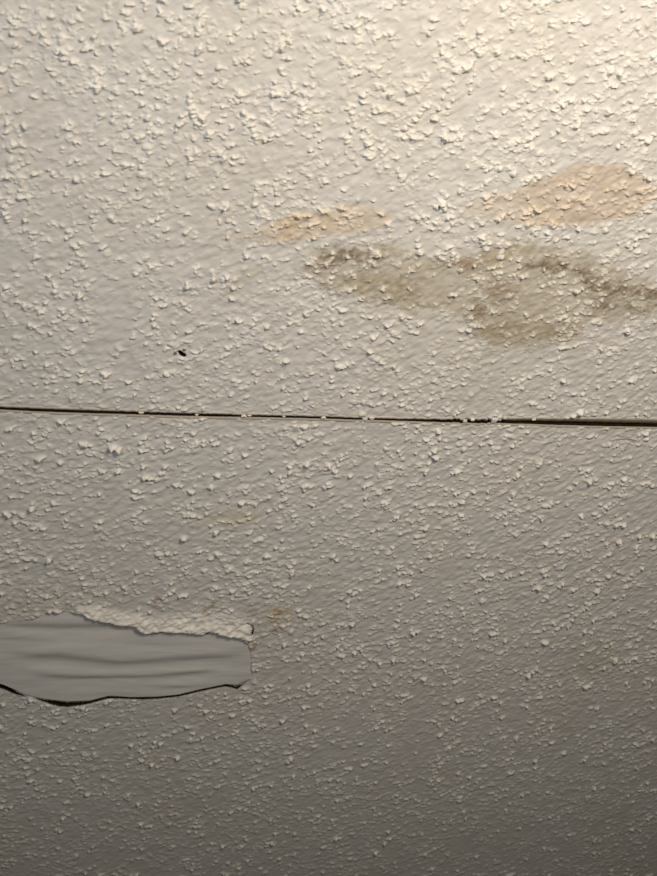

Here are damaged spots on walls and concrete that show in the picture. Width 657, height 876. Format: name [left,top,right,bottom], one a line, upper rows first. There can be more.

water stain [223,158,657,362]
crack [0,405,657,443]
spalling [0,606,254,708]